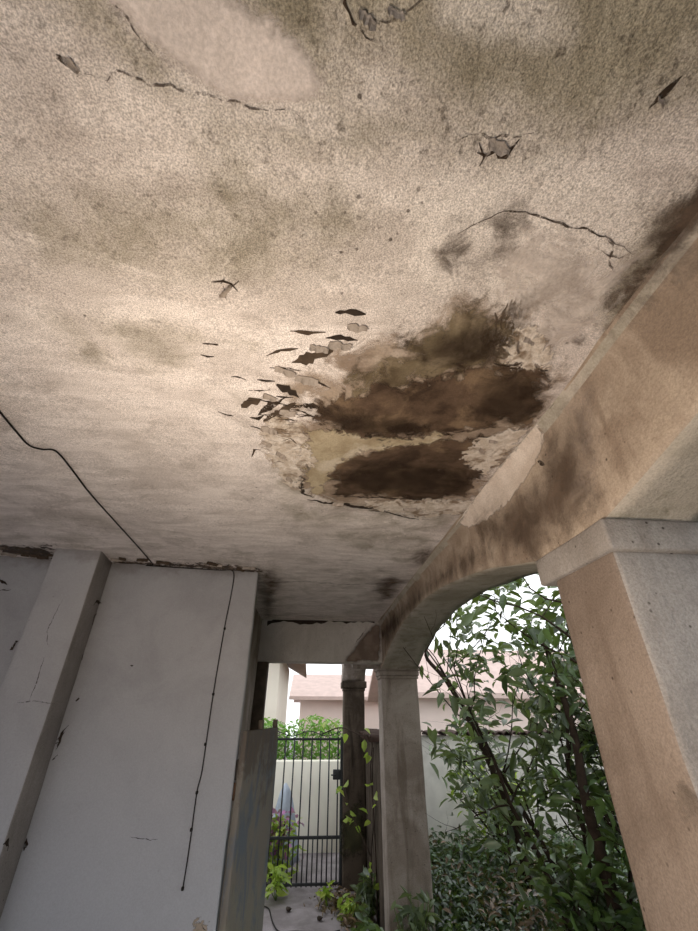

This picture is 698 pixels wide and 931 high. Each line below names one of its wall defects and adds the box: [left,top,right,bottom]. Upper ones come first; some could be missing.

damp [635,187,698,284]
spalling [233,297,562,528]